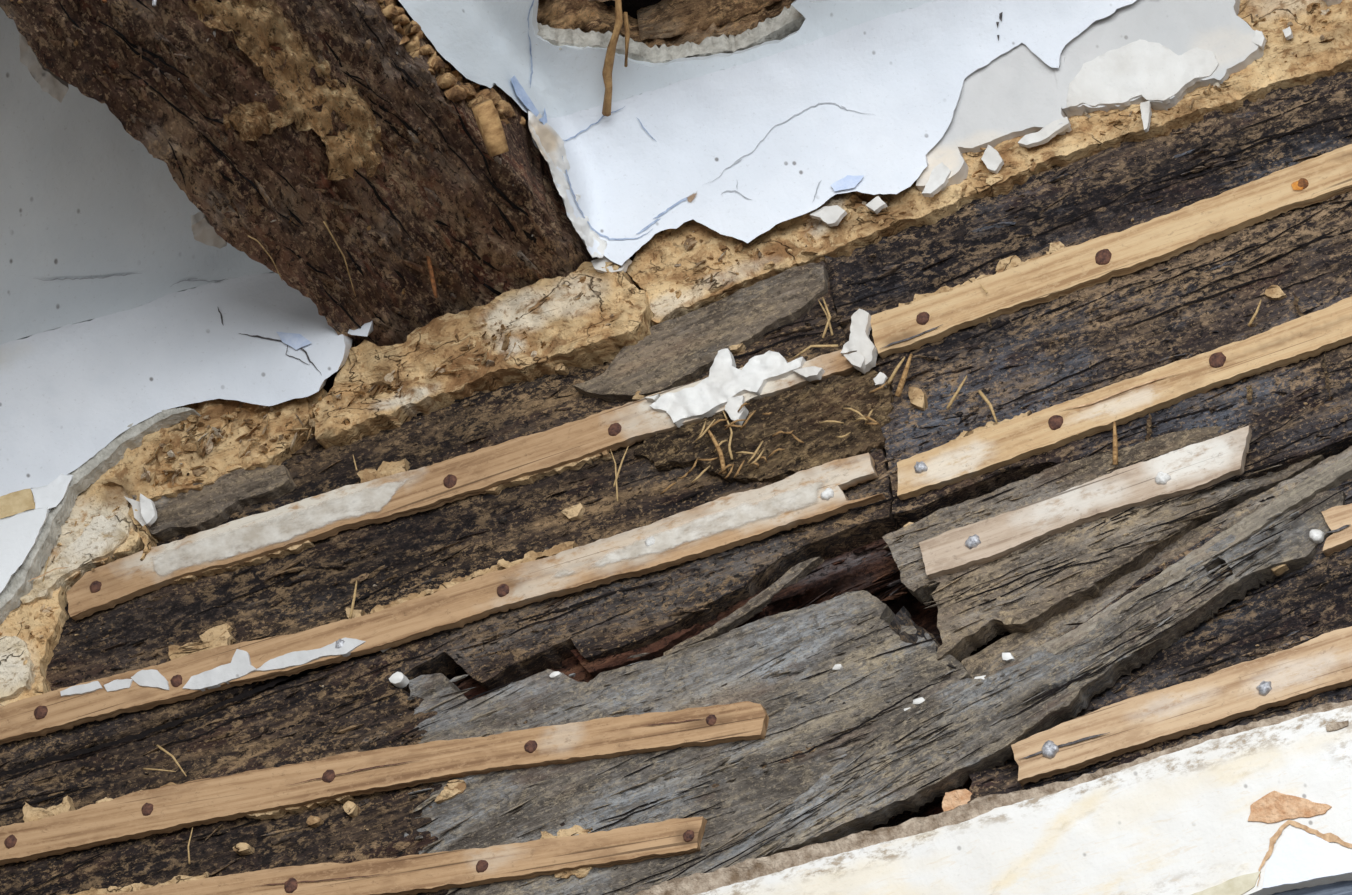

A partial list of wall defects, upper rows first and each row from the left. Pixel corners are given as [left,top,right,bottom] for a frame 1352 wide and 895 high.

spalling [536,0,805,63]
flaking render [916,0,1267,197]
peeling [18,0,555,329]
flaking render [511,75,632,273]
flaking render [810,175,864,227]
flaking render [866,196,888,214]
peeling [874,339,1020,446]
flaking render [0,407,201,625]
peeling [389,672,409,689]
peeling [343,791,385,818]
peeling [419,779,466,828]
peeling [1248,791,1352,889]